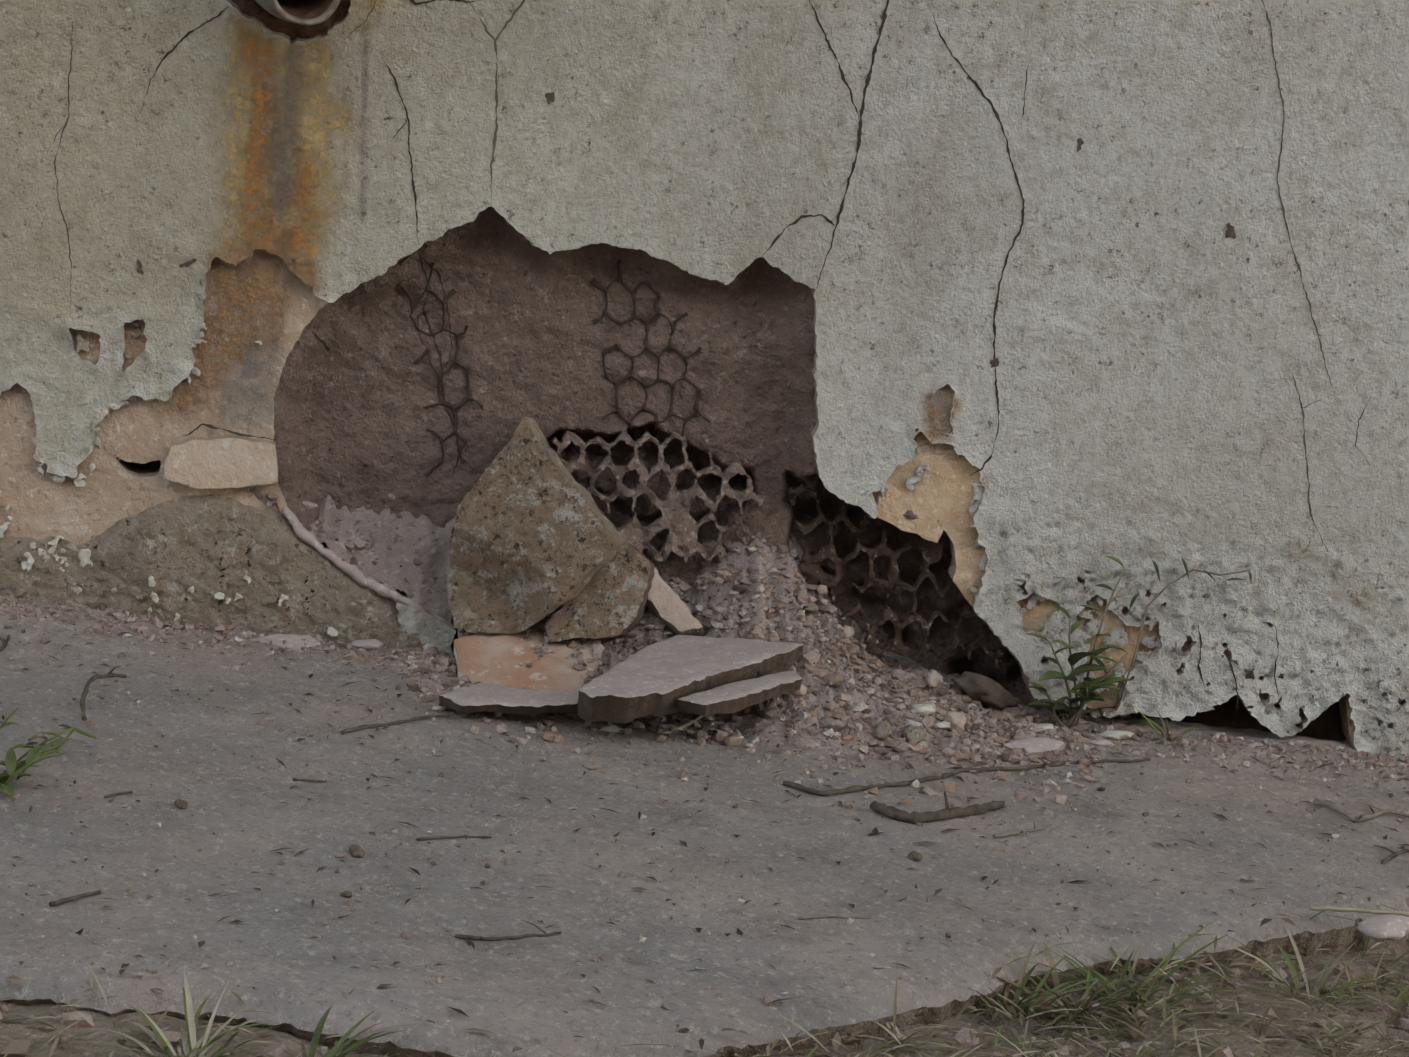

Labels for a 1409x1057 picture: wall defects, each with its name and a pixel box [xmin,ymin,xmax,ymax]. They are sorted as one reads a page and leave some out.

crack [141,6,230,111]
spalling [232,0,351,41]
crack [382,58,461,476]
crack [351,0,525,198]
crack [760,0,889,286]
crack [928,5,1029,476]
crack [1262,0,1371,550]
flaking render [0,206,1053,713]
peeling [1002,567,1174,709]
peeling [1176,625,1196,696]
peeling [1222,629,1284,707]
peeling [1339,696,1353,744]